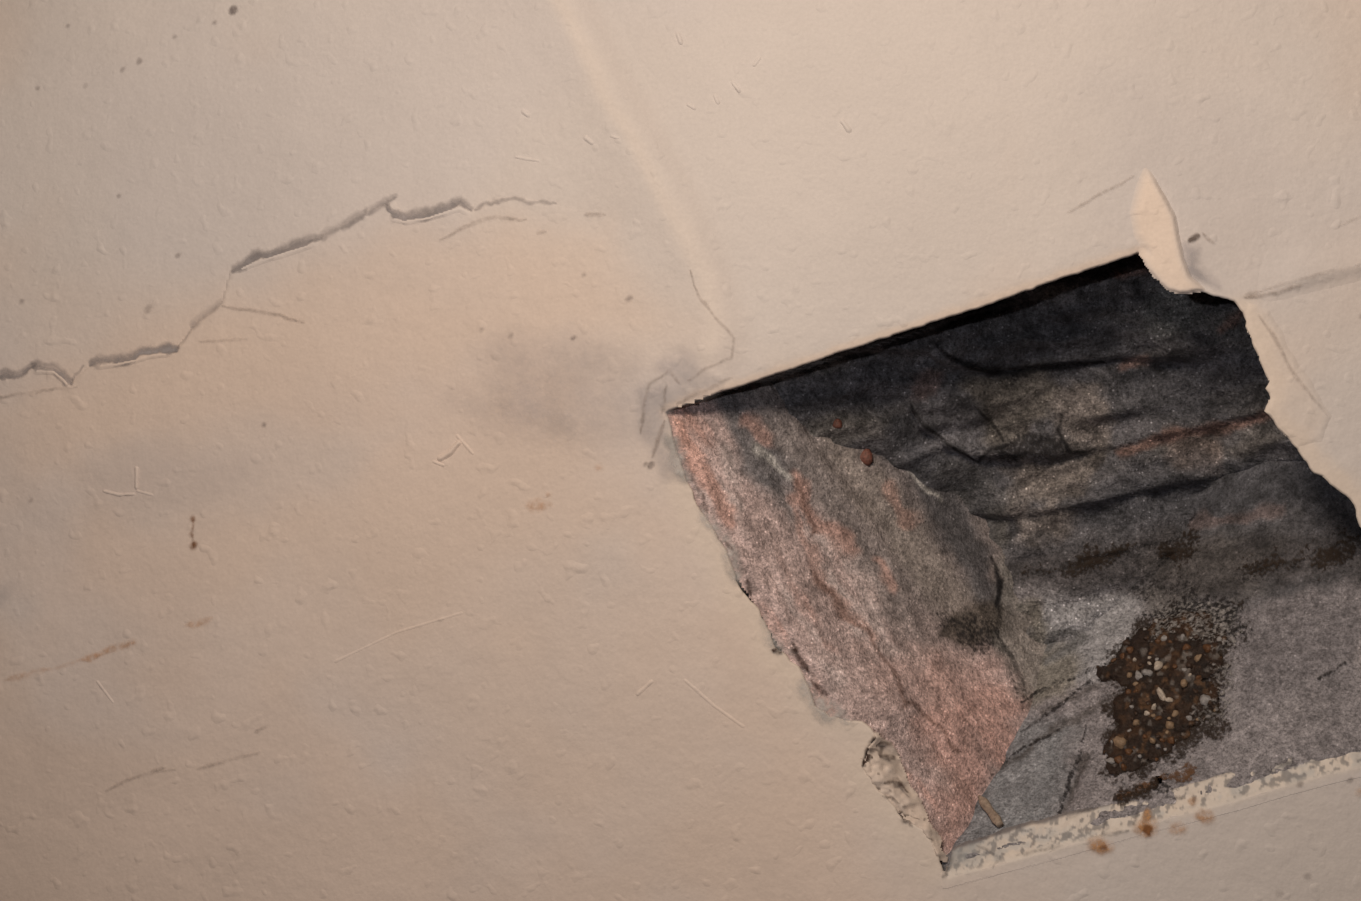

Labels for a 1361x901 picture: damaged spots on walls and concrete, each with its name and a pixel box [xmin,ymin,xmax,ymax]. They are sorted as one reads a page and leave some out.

crack [352,200,471,226]
crack [232,238,319,273]
crack [0,343,178,389]
flaking render [1246,303,1332,447]
spalling [771,641,848,722]
spalling [860,729,1361,889]